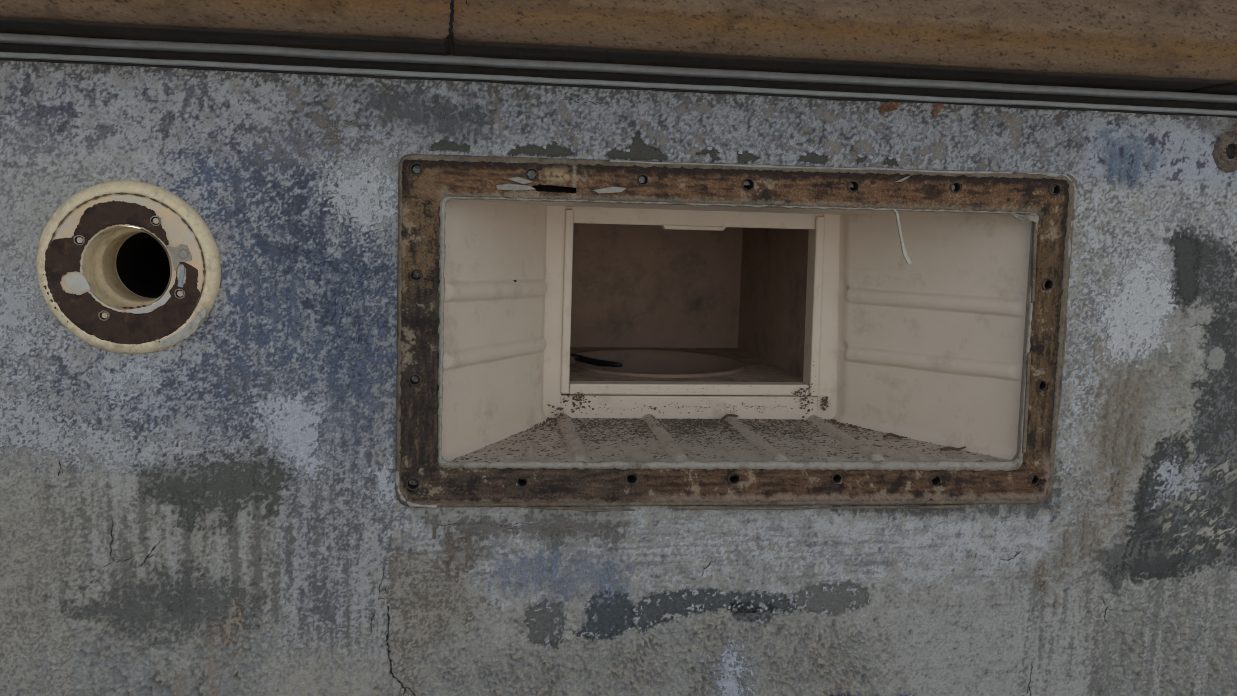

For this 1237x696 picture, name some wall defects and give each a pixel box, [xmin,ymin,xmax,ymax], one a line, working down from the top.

peeling [430,138,470,152]
peeling [508,141,575,157]
peeling [605,131,668,162]
peeling [696,147,759,164]
peeling [798,152,828,165]
peeling [857,154,901,167]
rust [1216,125,1237,173]
leakage [831,225,1237,610]
leakage [70,565,267,648]
crack [370,564,415,696]